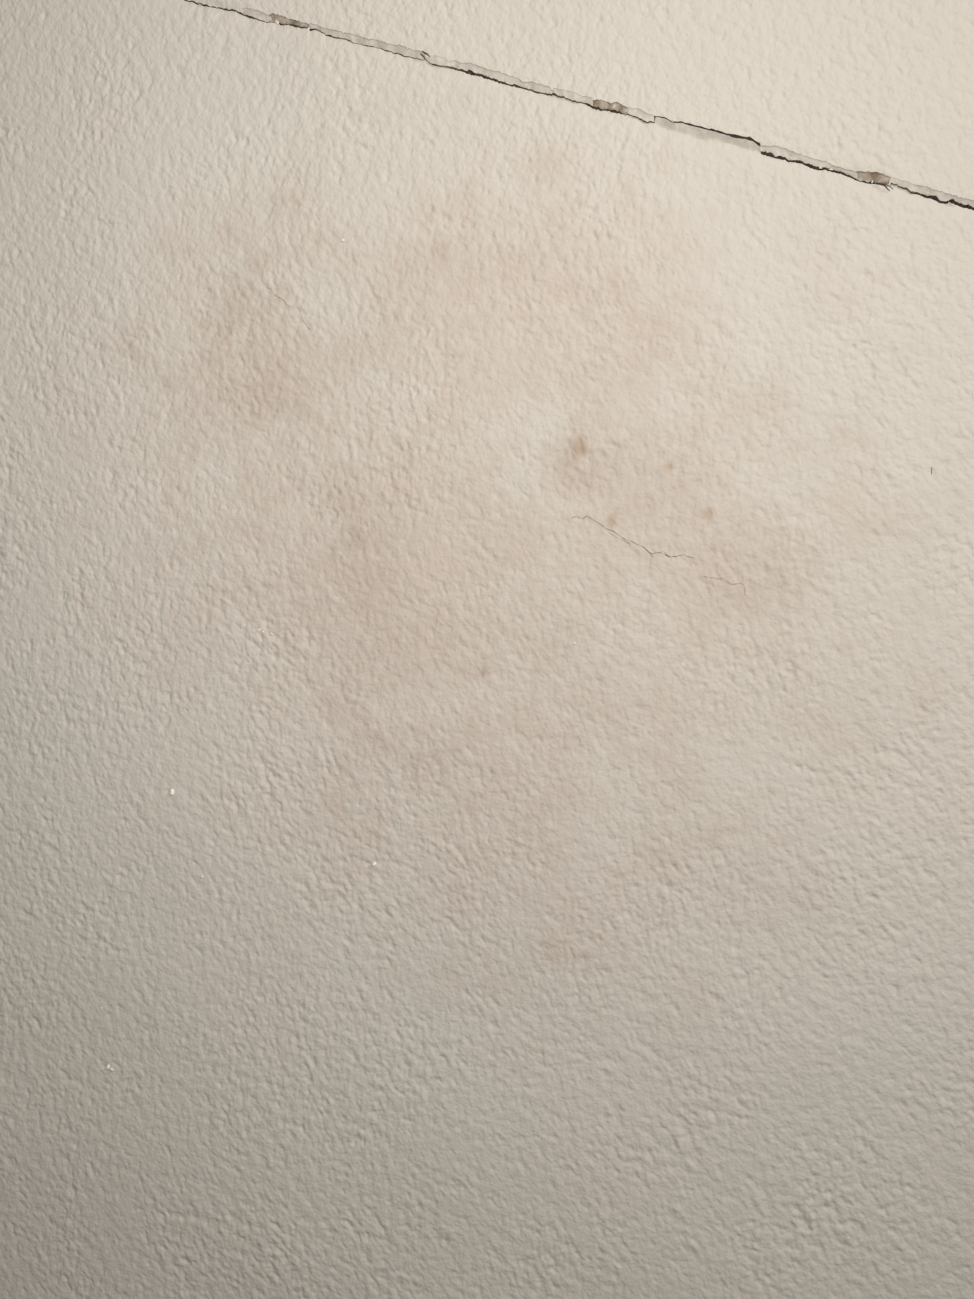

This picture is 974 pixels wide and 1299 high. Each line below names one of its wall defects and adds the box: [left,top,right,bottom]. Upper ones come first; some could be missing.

crack [184,0,974,210]